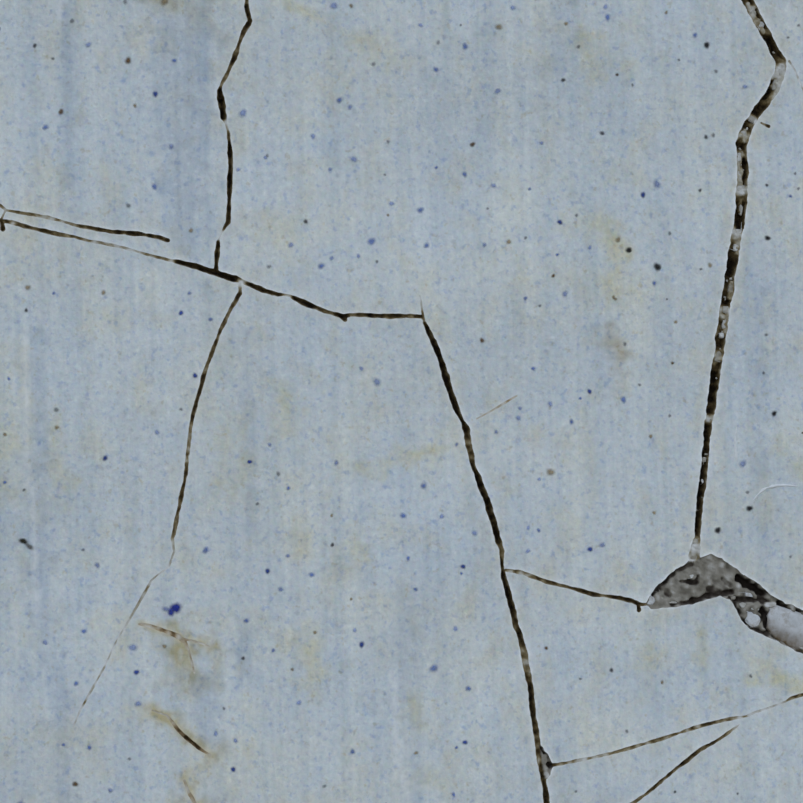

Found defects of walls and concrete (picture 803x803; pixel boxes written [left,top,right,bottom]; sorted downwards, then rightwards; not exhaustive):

crack [152,709,211,756]
crack [183,779,196,803]
crack [0,0,425,728]
crack [423,321,803,803]
spalling [646,554,803,653]
crack [688,0,803,563]